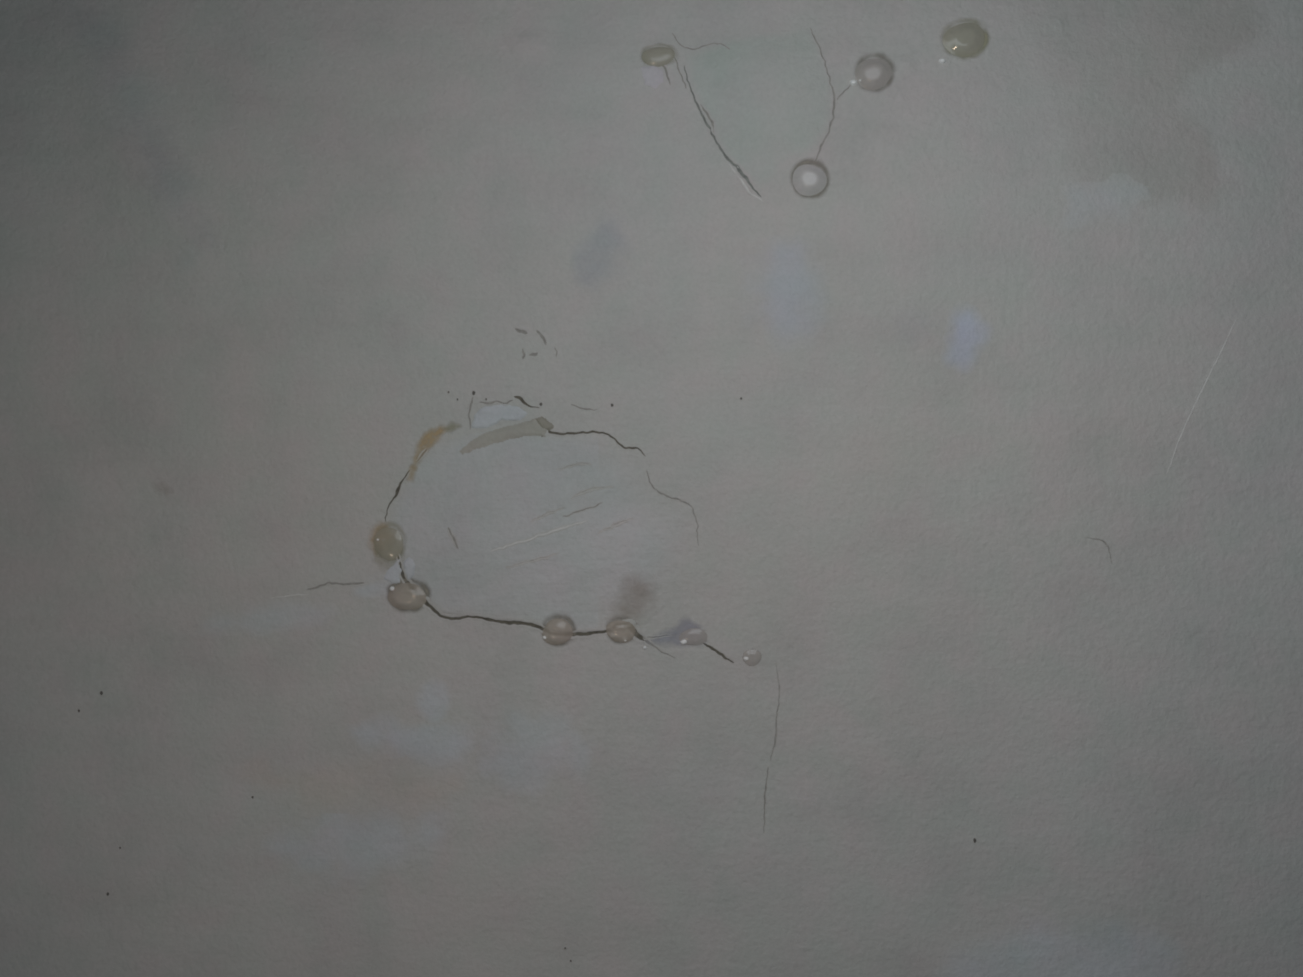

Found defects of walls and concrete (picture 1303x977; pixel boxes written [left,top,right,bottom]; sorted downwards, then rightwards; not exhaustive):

crack [672,33,763,202]
crack [810,28,852,161]
crack [384,448,428,522]
peeling [460,403,554,455]
crack [447,388,699,546]
crack [271,555,734,664]
crack [762,664,781,833]